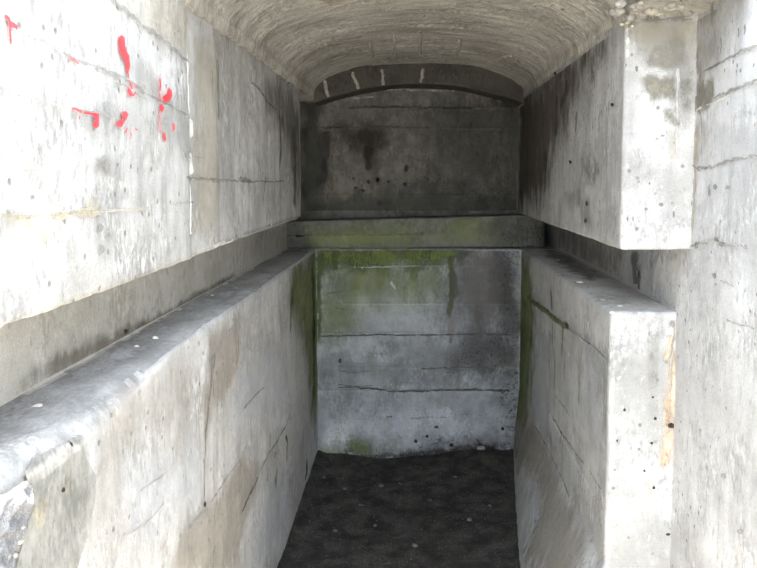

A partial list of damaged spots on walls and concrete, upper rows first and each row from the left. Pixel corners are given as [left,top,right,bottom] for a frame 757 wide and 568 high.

spalling [609,0,693,72]
damp [644,35,713,155]
crack [2,207,149,220]
crack [187,176,284,199]
damp [269,53,586,431]
crack [321,331,510,339]
crack [338,371,509,393]
rust [659,336,675,466]
spalling [0,435,96,568]